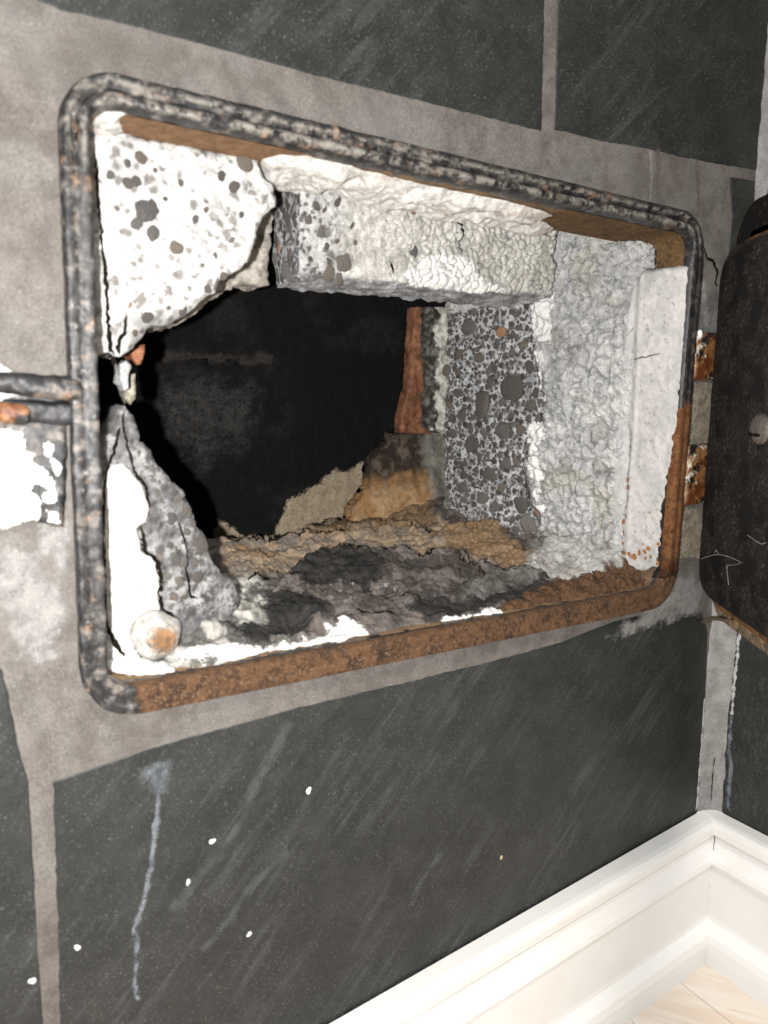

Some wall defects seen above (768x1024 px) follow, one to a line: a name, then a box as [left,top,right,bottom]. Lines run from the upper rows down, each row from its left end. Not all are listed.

peeling [0,429,62,529]
crack [95,154,127,368]
crack [102,410,198,658]
rust [127,399,692,714]
spalling [393,307,432,434]
spalling [442,302,546,535]
efflorescence [133,766,164,1000]